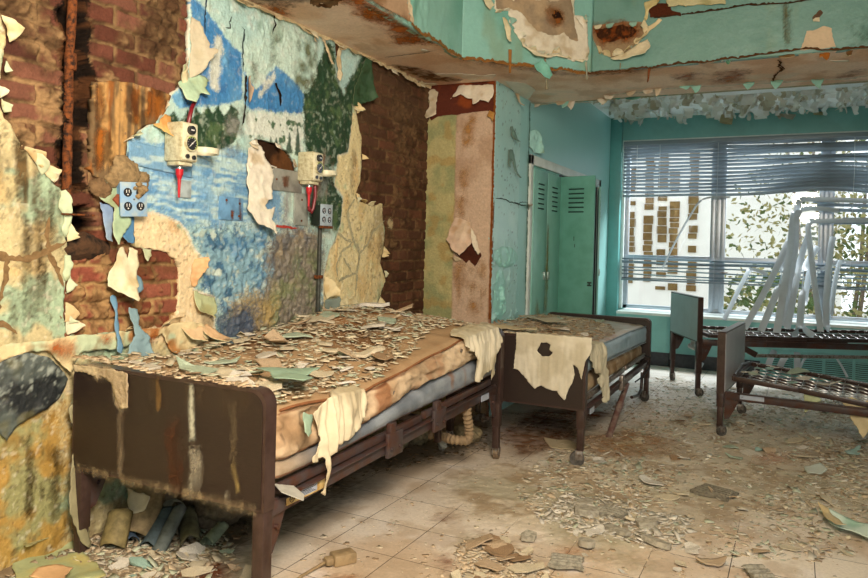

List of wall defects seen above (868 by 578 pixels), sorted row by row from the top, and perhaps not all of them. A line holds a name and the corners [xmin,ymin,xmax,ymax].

crack [204,0,248,125]
corrosion [343,0,535,73]
peeling [484,0,726,79]
corrosion [544,45,868,90]
crack [654,0,806,18]
peeling [592,78,868,126]
crack [772,60,785,81]
crack [0,217,67,334]
flaking render [0,0,495,496]
peeling [450,324,503,382]
leakage [25,458,33,517]
peeling [69,455,91,548]